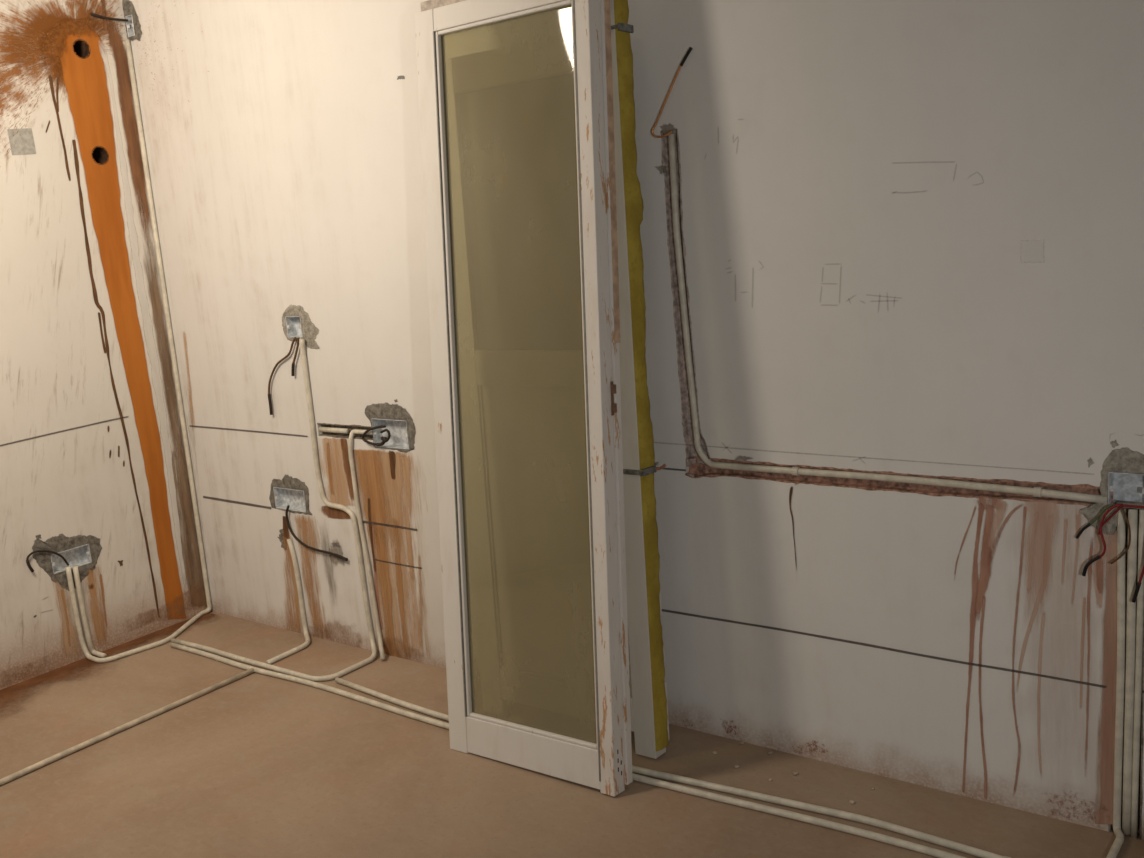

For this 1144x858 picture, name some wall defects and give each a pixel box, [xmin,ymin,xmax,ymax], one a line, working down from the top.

rust [0,0,216,708]
rust [283,516,332,637]
rust [322,438,422,657]
crack [789,481,799,569]
rust [954,497,1117,824]